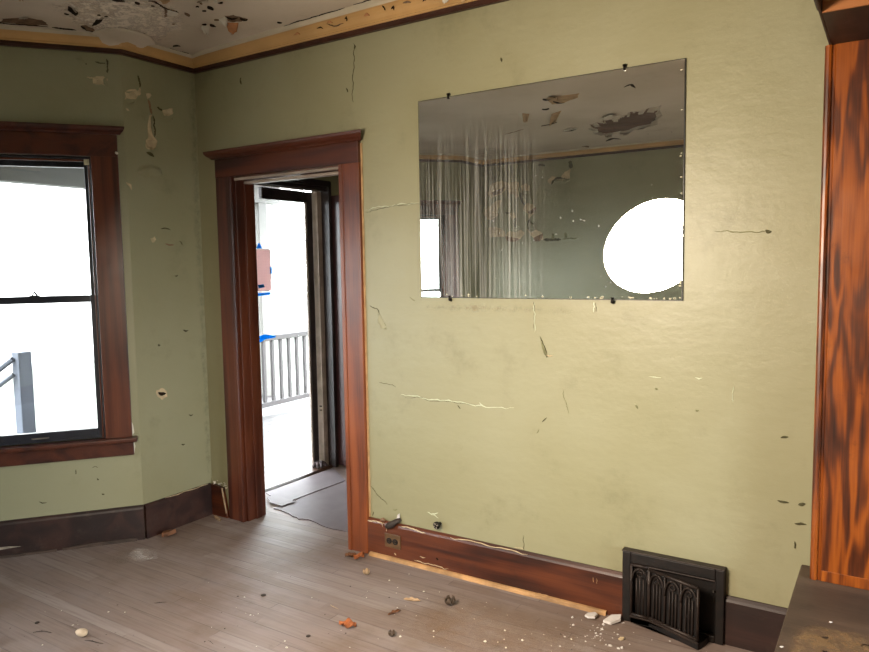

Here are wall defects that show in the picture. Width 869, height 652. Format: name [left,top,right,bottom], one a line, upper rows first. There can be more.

peeling [81,14,108,32]
peeling [135,0,248,35]
peeling [125,76,173,157]
crack [379,382,511,409]